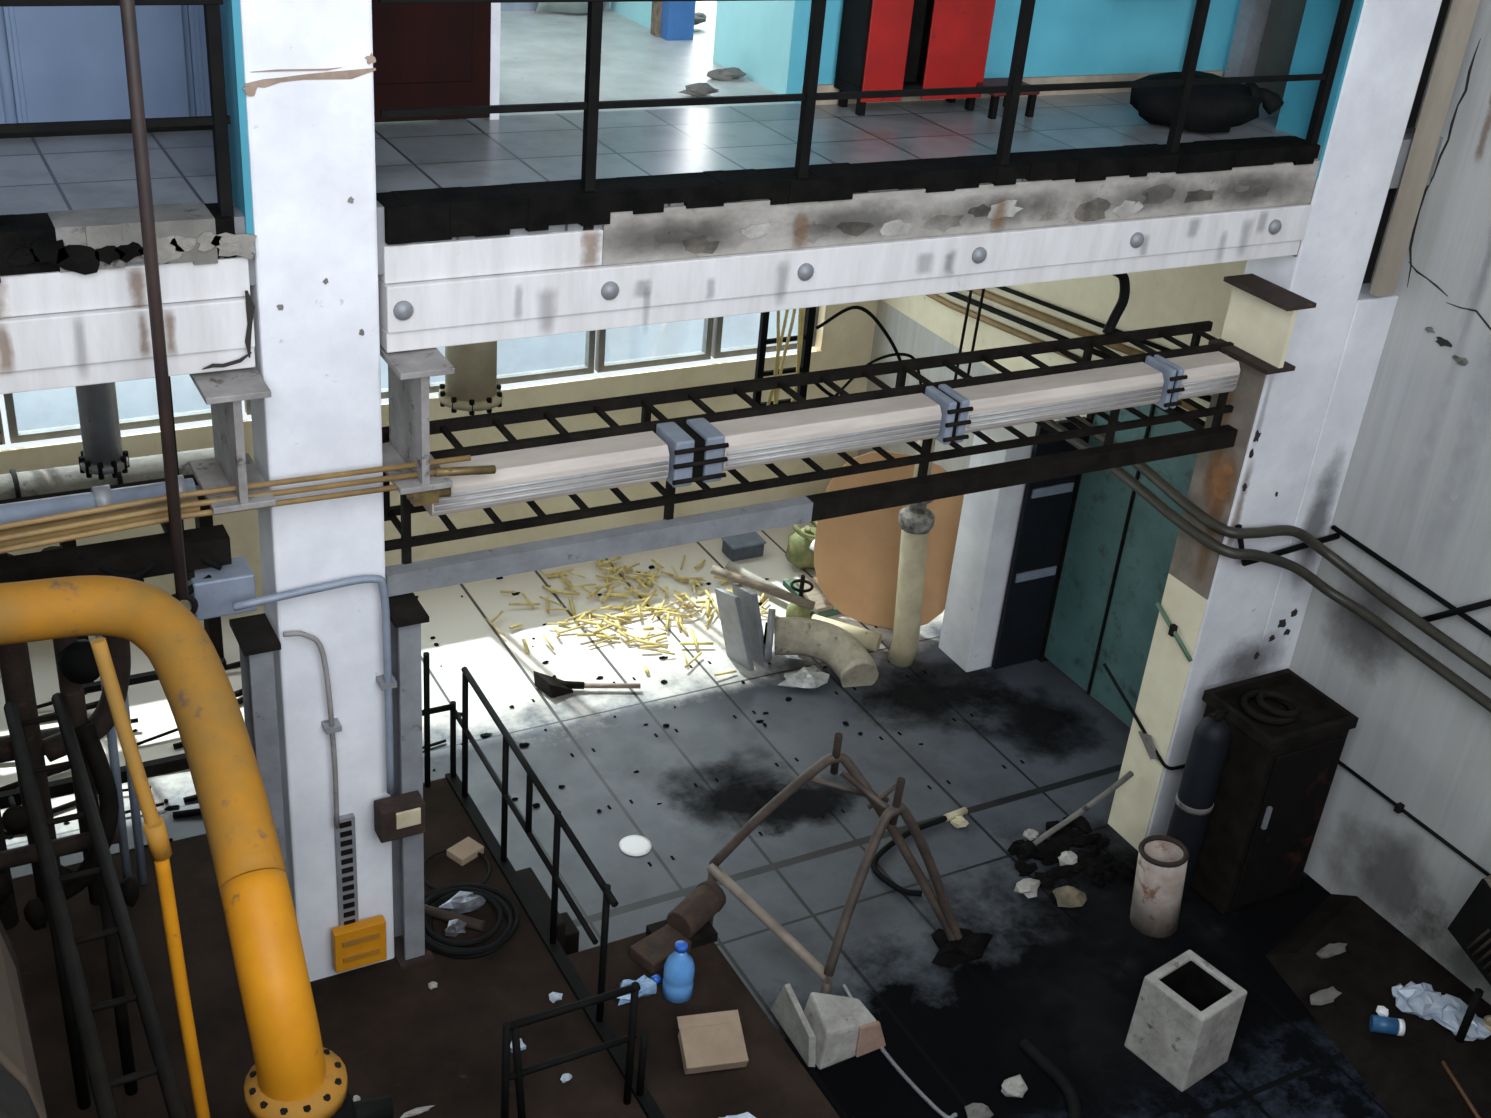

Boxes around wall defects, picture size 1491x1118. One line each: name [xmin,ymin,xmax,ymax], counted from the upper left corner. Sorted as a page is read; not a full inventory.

crack [1407,38,1491,336]
spalling [7,231,257,275]
crack [202,290,255,370]